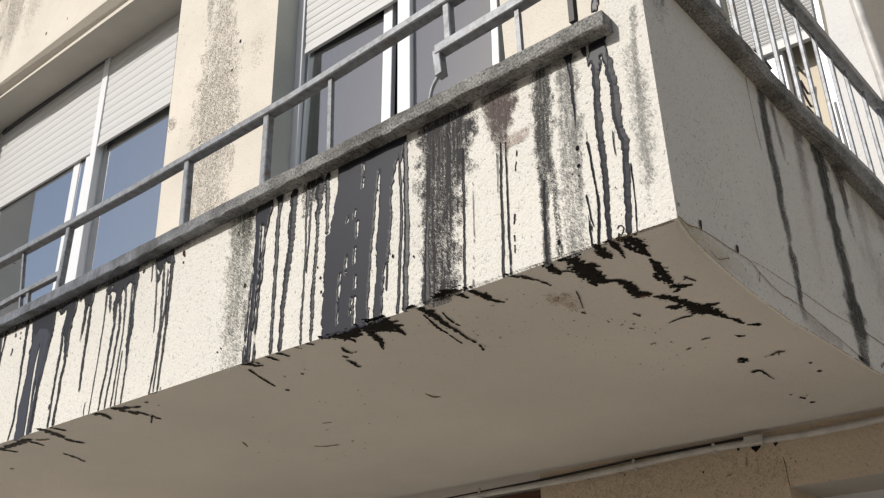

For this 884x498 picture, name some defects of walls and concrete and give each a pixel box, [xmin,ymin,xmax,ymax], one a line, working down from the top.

water stain [187,0,264,151]
water stain [190,145,235,220]
water stain [218,208,257,374]
water stain [480,52,589,267]
crack [678,216,884,357]
water stain [732,62,884,367]